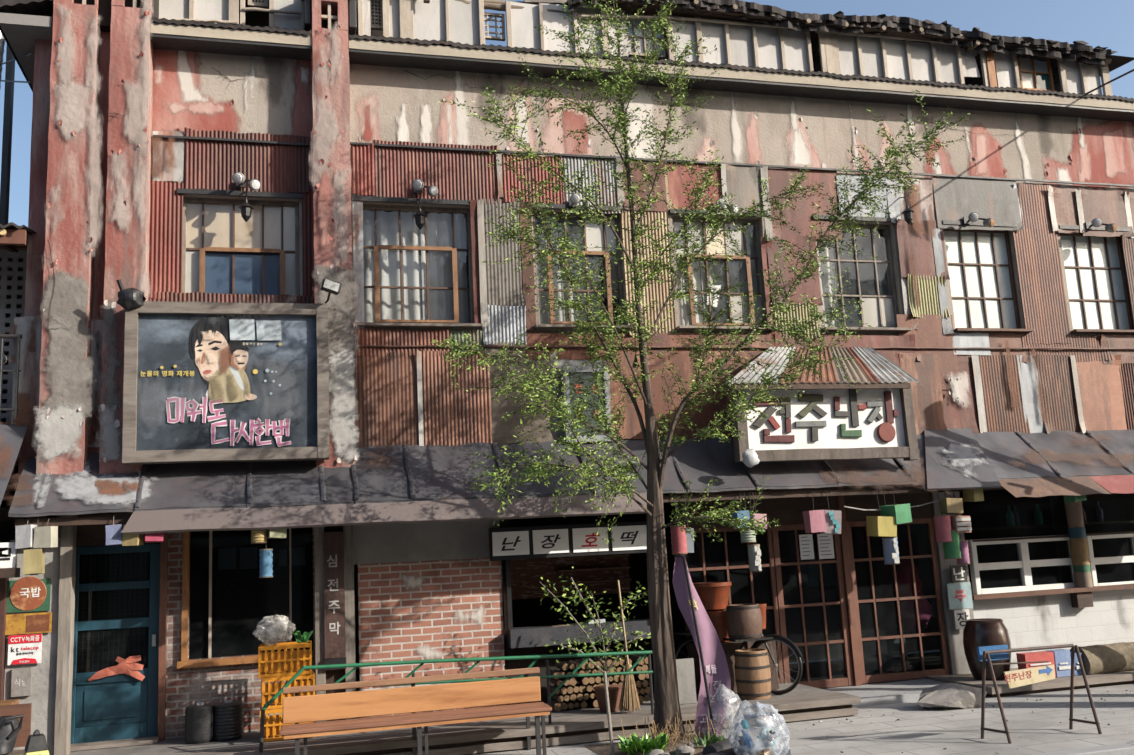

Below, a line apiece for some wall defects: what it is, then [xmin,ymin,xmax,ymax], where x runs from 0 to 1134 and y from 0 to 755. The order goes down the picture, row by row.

peeling [56,0,239,254]
peeling [292,23,352,274]
peeling [356,94,381,143]
peeling [506,79,593,157]
peeling [624,84,656,159]
peeling [695,137,716,162]
peeling [786,117,827,168]
peeling [924,124,1007,178]
peeling [1042,120,1134,190]
rust [905,183,935,237]
spalling [140,271,150,298]
rust [1006,341,1019,408]